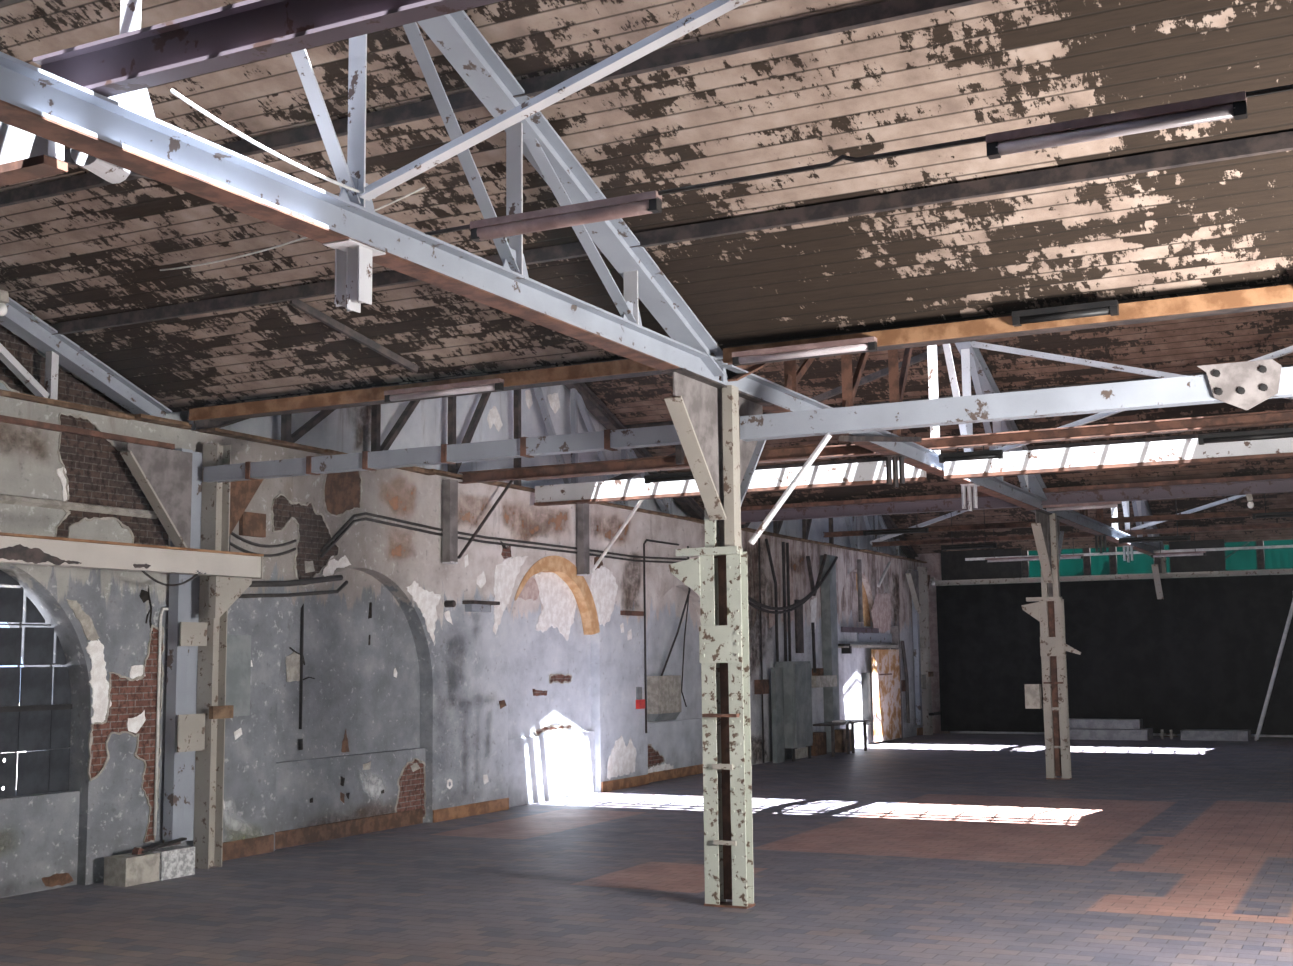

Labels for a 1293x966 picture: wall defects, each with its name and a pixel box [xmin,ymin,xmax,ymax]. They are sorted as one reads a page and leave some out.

flaking render [0,324,170,546]
peeling [0,544,81,565]
flaking render [271,471,362,587]
peeling [406,581,452,646]
peeling [463,541,577,641]
peeling [590,554,632,641]
flaking render [66,599,164,843]
flaking render [381,758,426,819]
peeling [607,735,673,780]